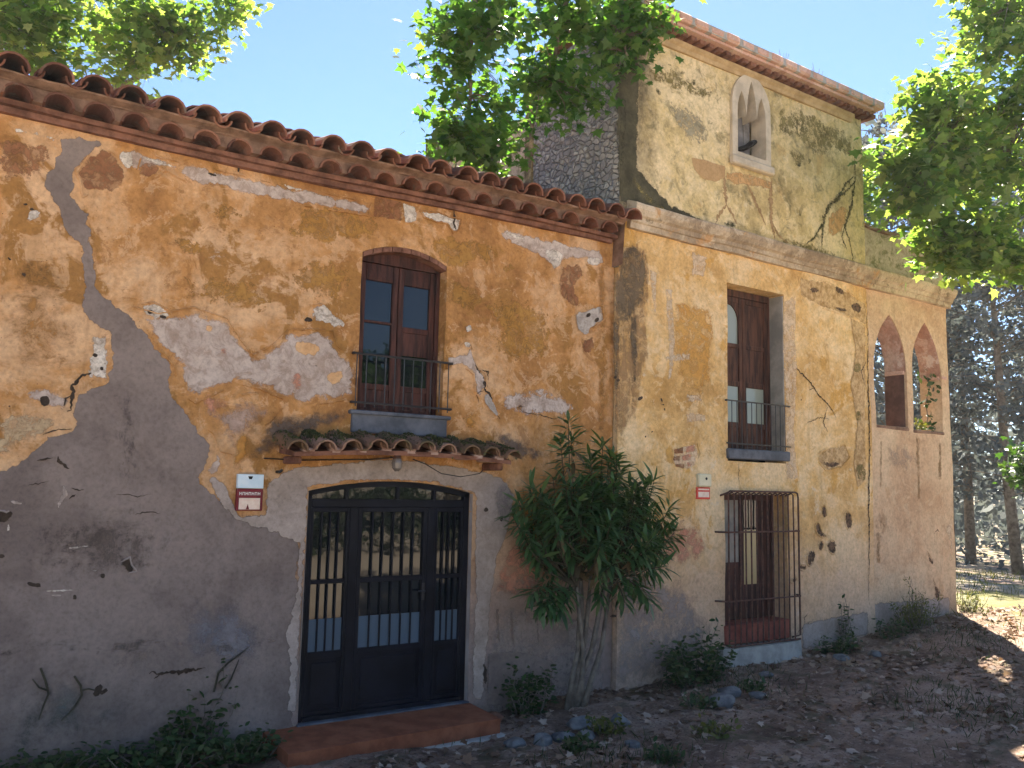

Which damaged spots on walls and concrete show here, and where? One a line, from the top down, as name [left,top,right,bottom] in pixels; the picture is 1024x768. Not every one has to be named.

peeling [75,149,124,198]
crack [716,147,856,260]
damp [779,109,851,167]
crack [28,372,91,499]
peeling [135,301,357,433]
spalling [445,325,498,416]
spalling [576,305,605,334]
damp [502,231,713,429]
crack [789,363,833,432]
peeling [790,504,836,584]
peeling [844,510,853,530]
crack [149,667,205,679]